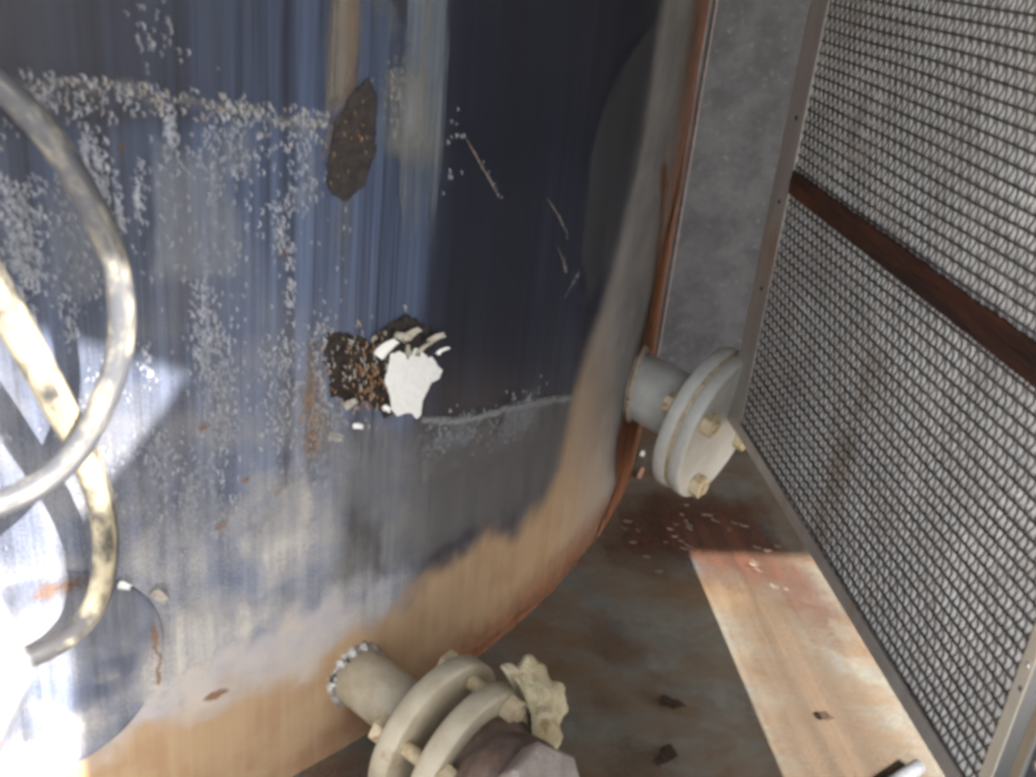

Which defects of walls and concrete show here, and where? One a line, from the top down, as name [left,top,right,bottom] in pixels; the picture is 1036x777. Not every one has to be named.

water stain [0,171,103,353]
water stain [18,0,572,583]
rust [295,310,395,478]
peeling [371,314,450,419]
rust [592,84,903,777]
rust [150,588,170,605]
rust [205,690,227,701]